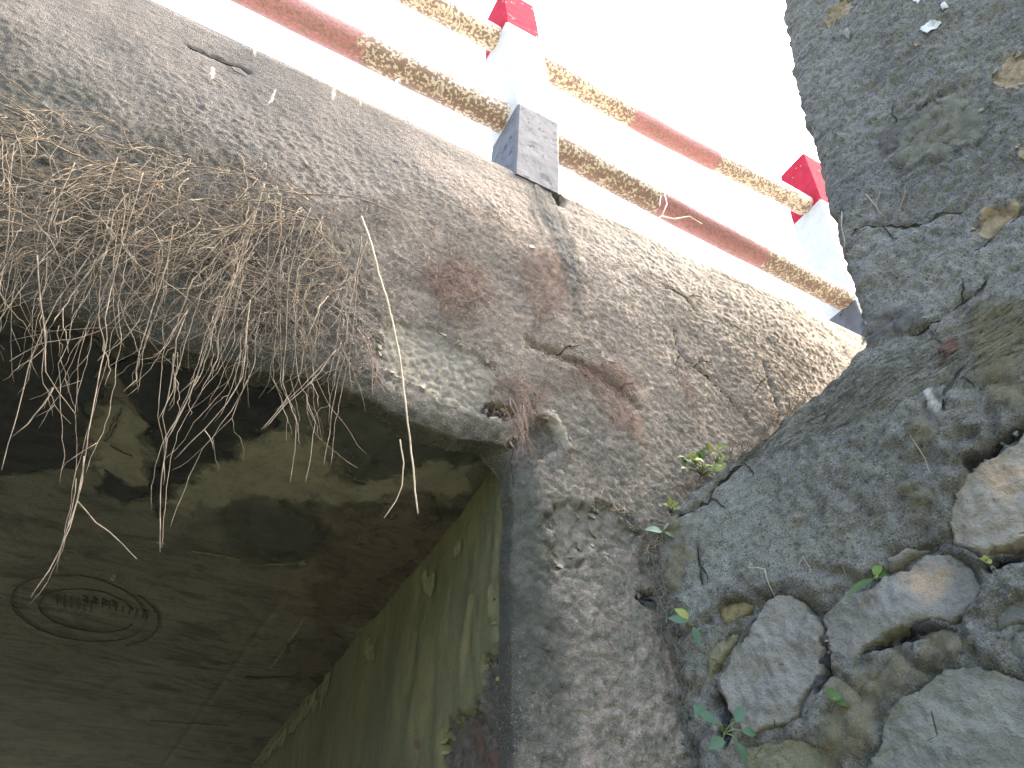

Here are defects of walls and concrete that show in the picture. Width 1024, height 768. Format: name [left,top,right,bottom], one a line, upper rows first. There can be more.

crack [851,212,963,239]
crack [544,345,634,394]
leakage [223,496,332,567]